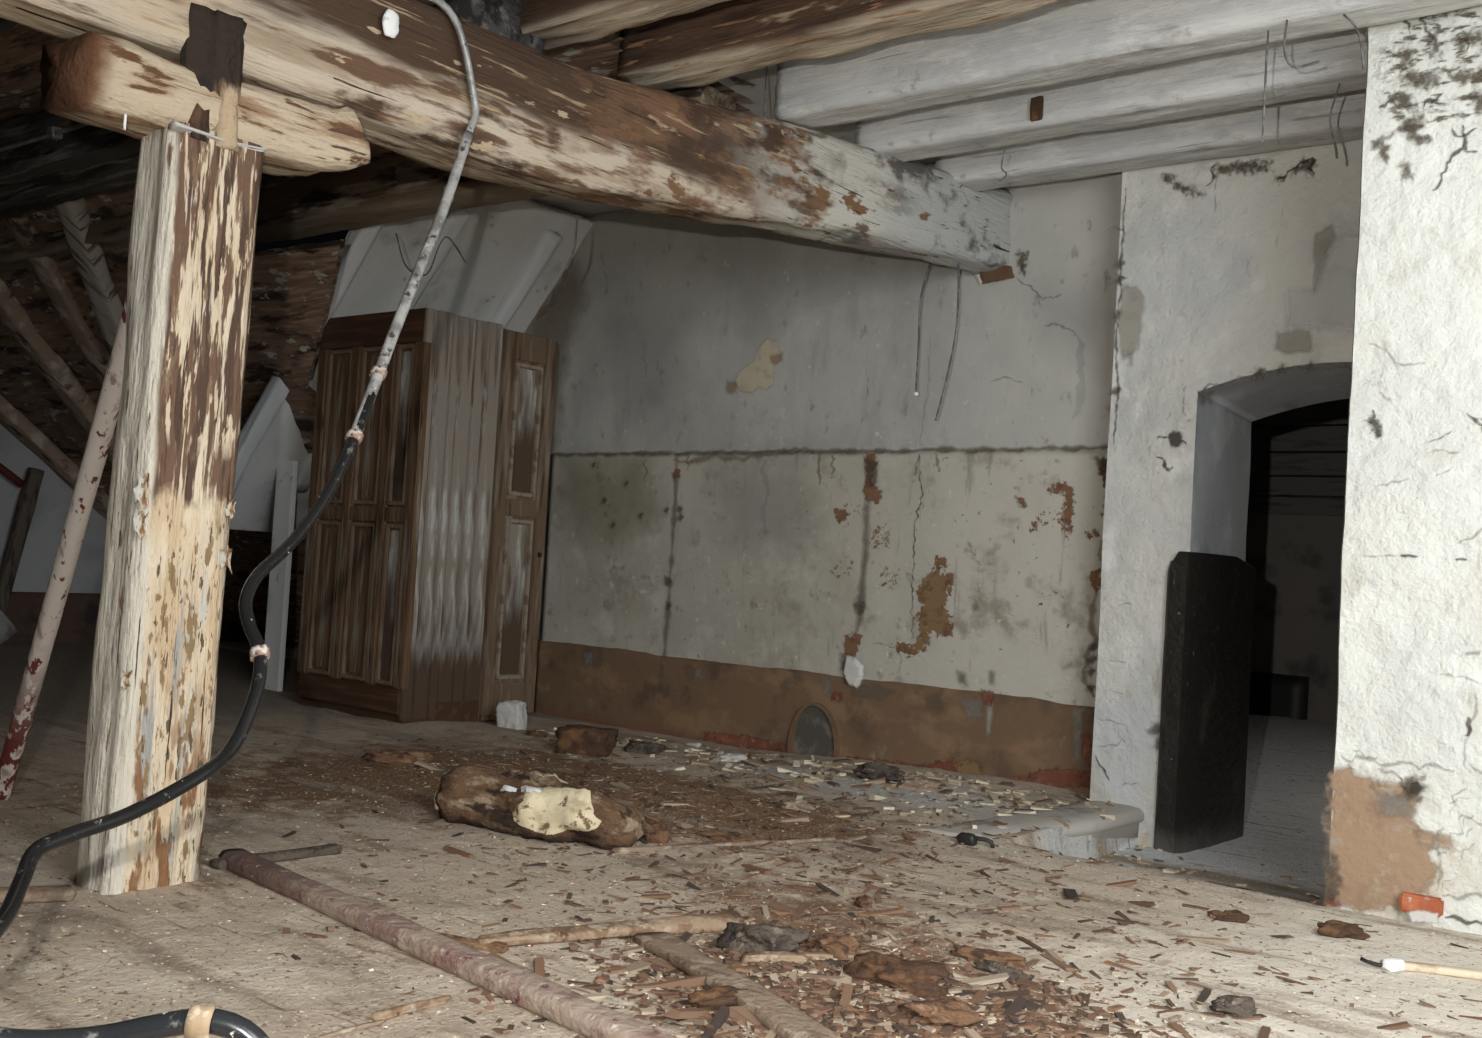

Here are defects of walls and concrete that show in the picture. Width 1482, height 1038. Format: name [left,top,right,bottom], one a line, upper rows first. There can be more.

leakage [1372,10,1482,190]
leakage [1206,157,1316,186]
peeling [727,339,782,393]
corrosion [831,453,897,657]
corrosion [896,556,954,658]
crack [1465,717,1473,736]
flaking render [1325,768,1452,923]
crack [1446,915,1482,925]